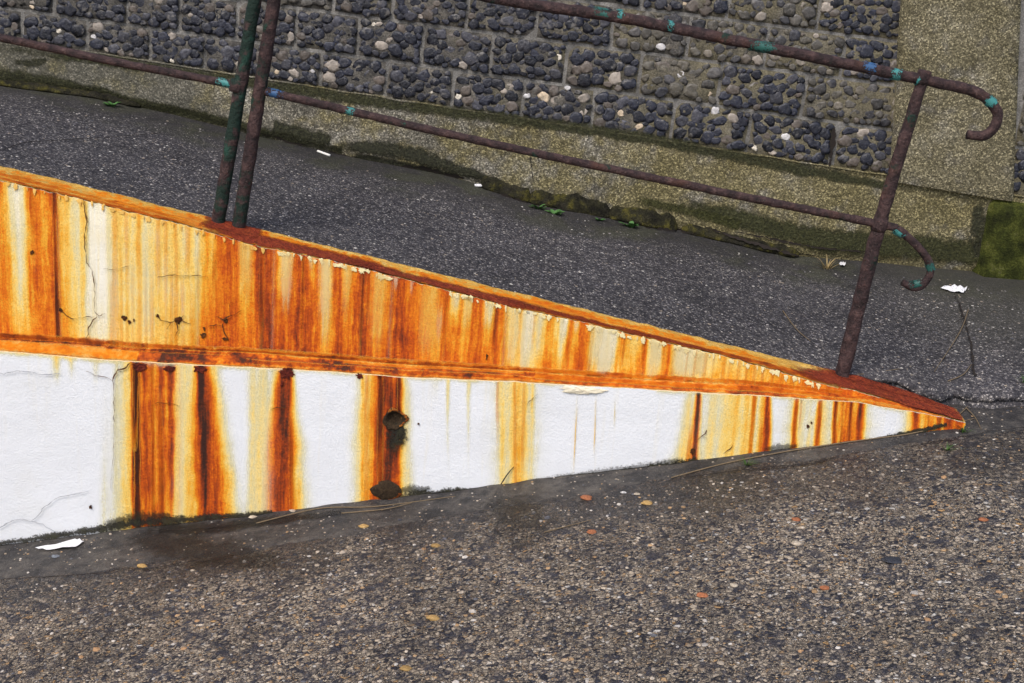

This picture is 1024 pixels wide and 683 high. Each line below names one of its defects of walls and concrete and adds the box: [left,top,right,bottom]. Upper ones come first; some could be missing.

crack [58,199,127,338]
corrosion [0,170,966,530]
peeling [586,325,821,390]
crack [0,492,84,532]
spalling [370,480,402,500]